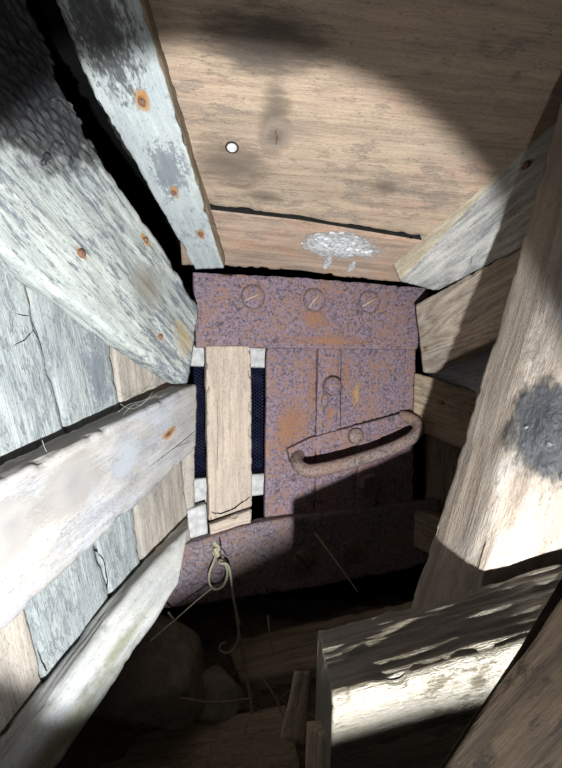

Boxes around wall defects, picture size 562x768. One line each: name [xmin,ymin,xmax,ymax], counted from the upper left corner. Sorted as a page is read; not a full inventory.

corrosion [135,91,149,111]